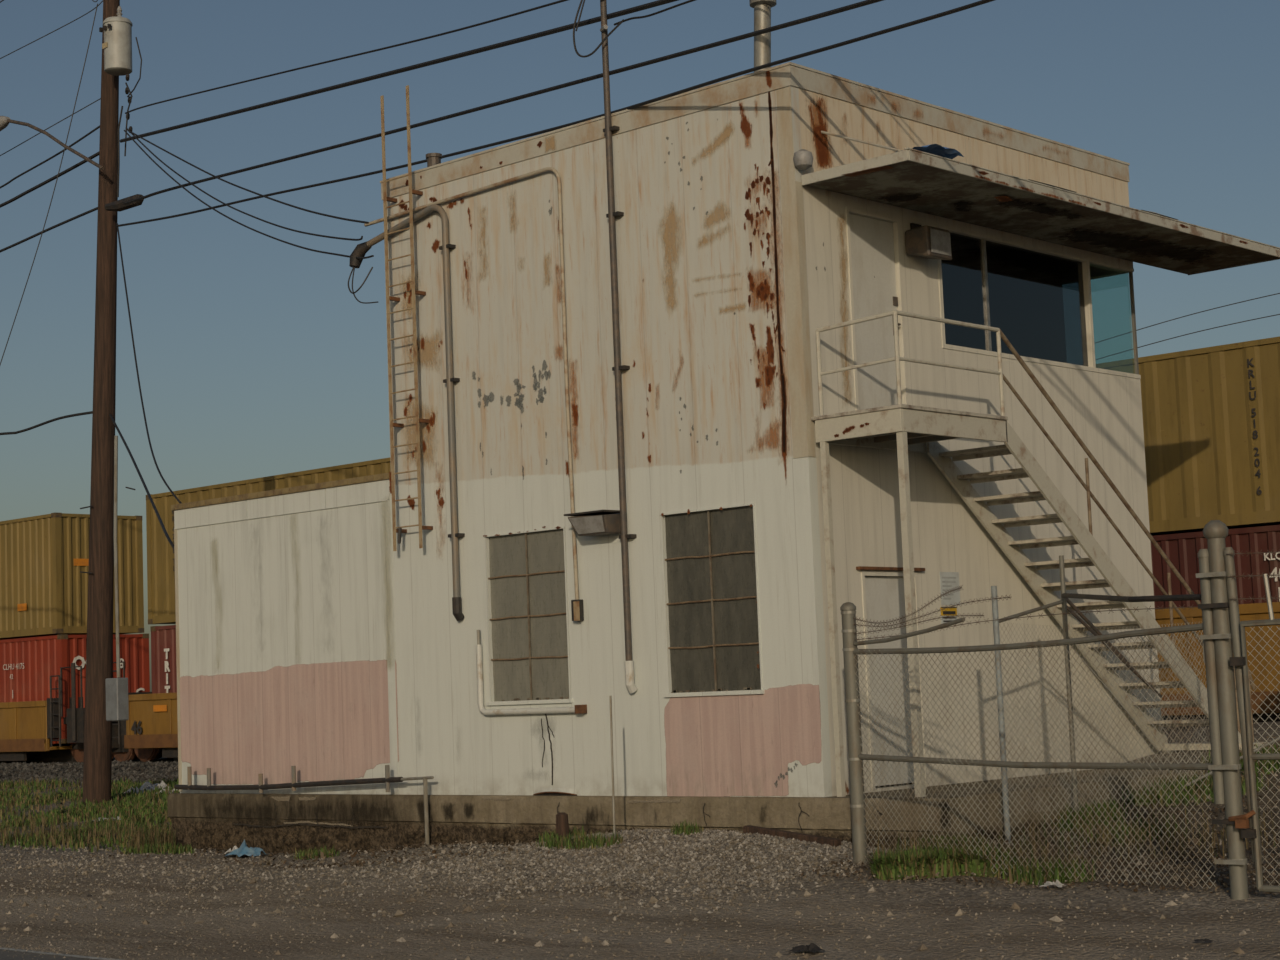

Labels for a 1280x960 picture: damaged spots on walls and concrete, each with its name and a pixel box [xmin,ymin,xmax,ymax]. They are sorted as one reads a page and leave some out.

rust [701,103,757,157]
rust [808,98,893,177]
rust [429,197,485,267]
rust [663,208,678,307]
rust [745,176,771,240]
rust [403,280,416,311]
rust [720,271,774,312]
rust [409,335,442,365]
peeling [472,360,551,427]
rust [749,324,776,405]
rust [404,394,435,460]
rust [759,424,778,449]